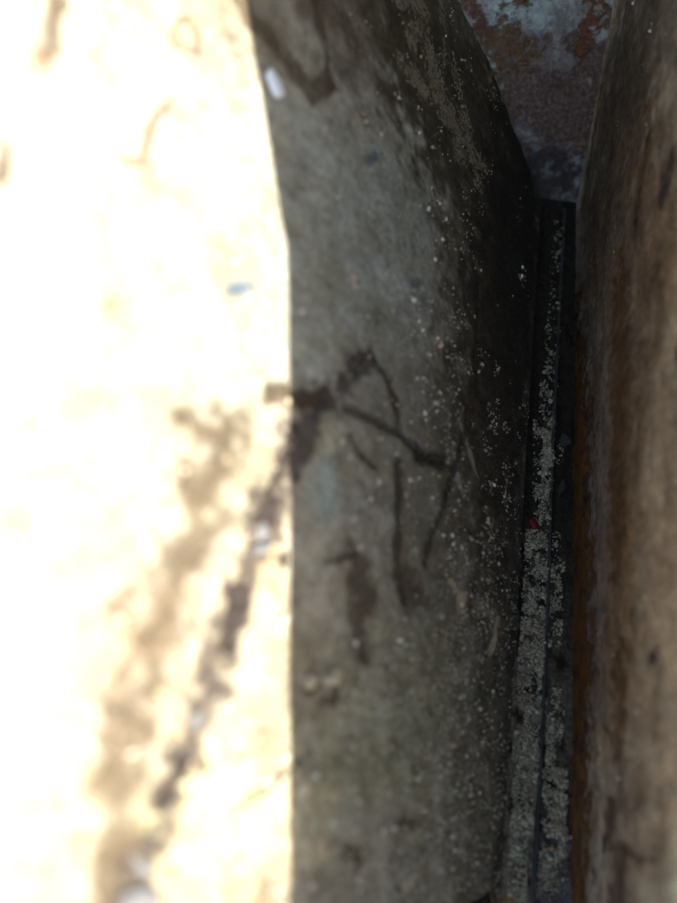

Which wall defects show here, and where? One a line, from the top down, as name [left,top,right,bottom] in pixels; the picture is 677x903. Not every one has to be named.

corrosion [460,0,542,79]
corrosion [574,0,608,61]
crack [108,276,484,903]
corrosion [571,291,599,903]